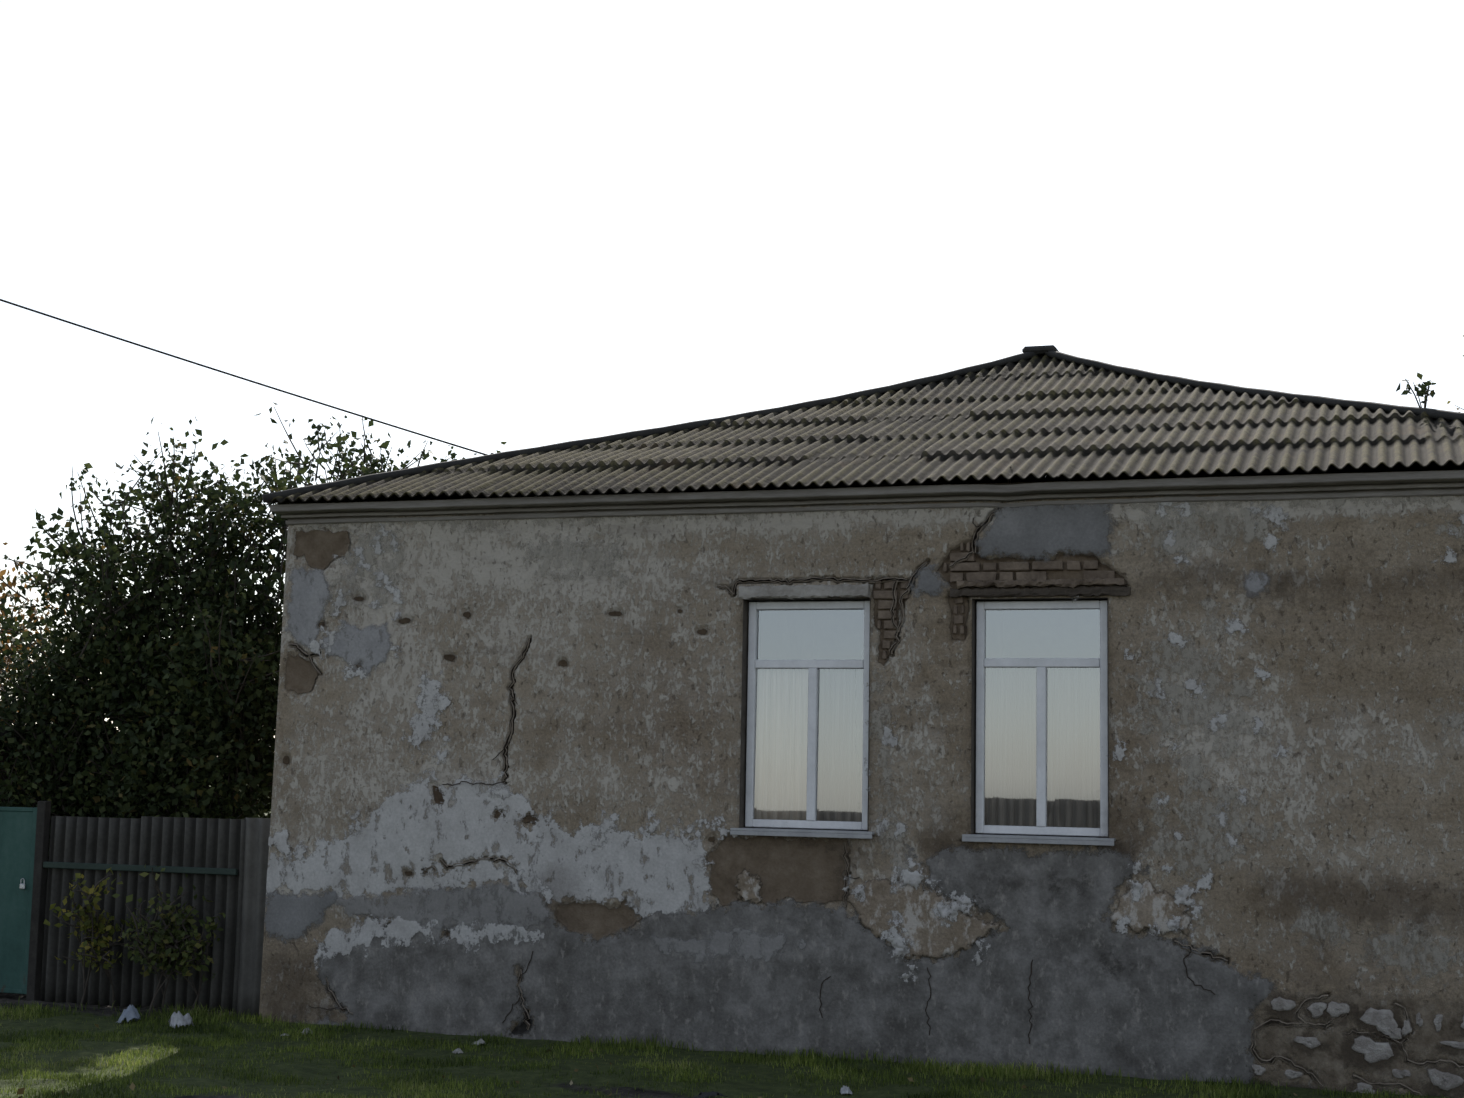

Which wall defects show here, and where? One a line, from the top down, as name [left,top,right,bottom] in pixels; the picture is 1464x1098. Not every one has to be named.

spalling [285,525,393,694]
crack [442,638,532,786]
peeling [266,654,850,970]
flaking render [864,579,916,872]
flaking render [938,542,1127,640]
peeling [1108,598,1291,941]